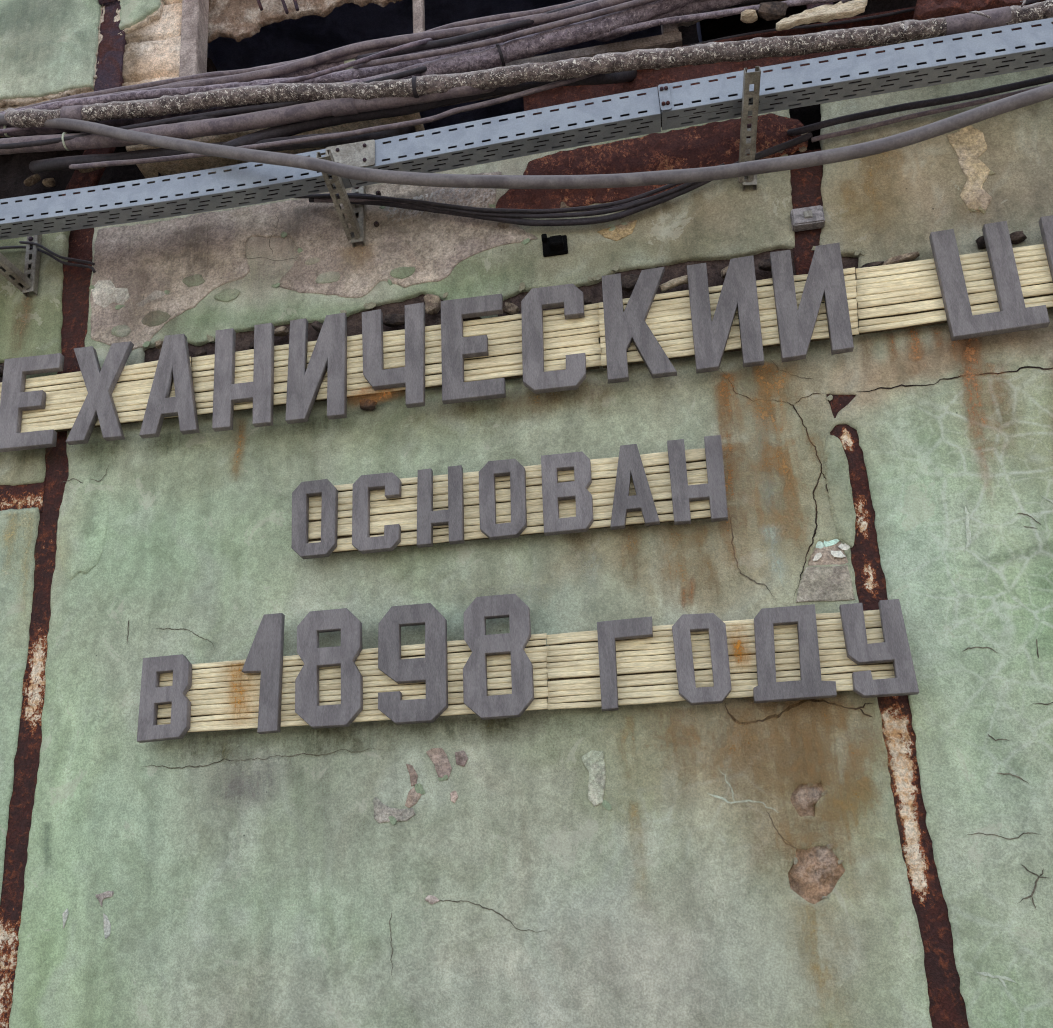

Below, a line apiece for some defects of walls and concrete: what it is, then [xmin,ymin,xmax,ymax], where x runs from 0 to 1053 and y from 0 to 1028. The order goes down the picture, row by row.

corrosion [496,183,684,209]
corrosion [523,113,808,175]
peeling [946,125,995,214]
peeling [89,183,538,363]
flaking render [577,260,730,309]
flaking render [841,249,866,280]
crack [858,366,1053,392]
corrosion [719,373,742,543]
crack [722,360,830,601]
crack [439,900,545,932]
spalling [788,844,845,904]
crack [1019,865,1047,908]